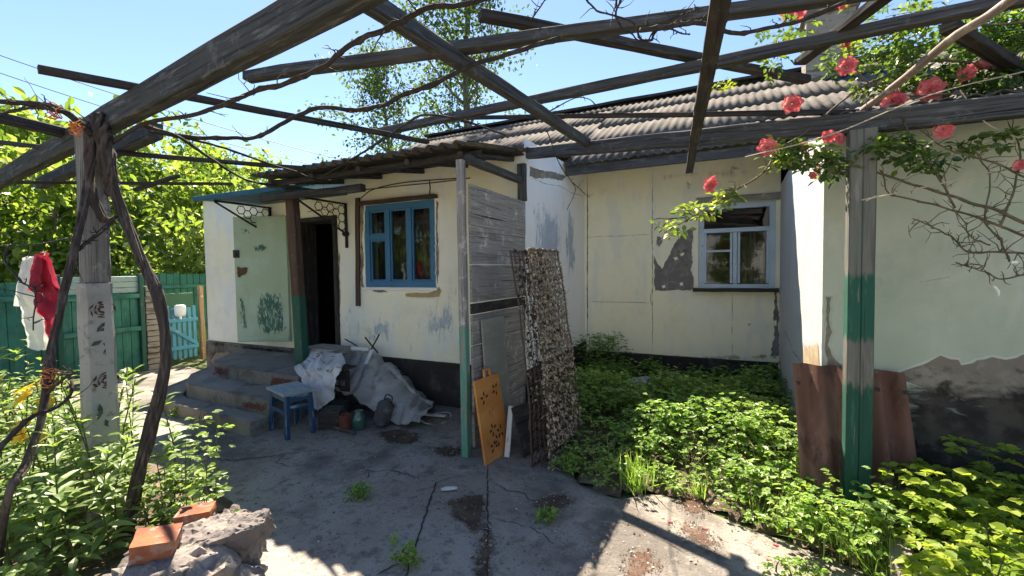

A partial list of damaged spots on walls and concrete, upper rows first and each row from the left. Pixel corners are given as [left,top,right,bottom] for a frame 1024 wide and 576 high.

flaking render [529,165,566,182]
flaking render [653,226,695,292]
flaking render [803,296,843,367]
flaking render [898,352,1024,399]